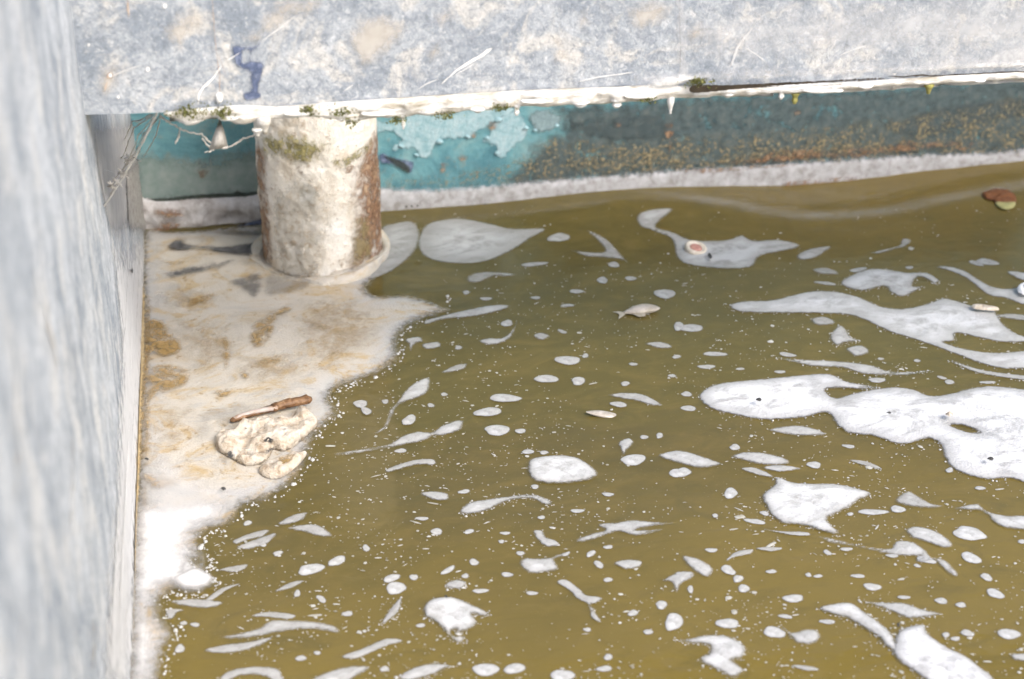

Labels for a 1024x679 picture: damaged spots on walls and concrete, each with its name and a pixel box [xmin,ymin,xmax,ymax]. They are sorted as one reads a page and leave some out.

peeling [377,108,561,159]
leakage [164,46,1024,139]
corrosion [347,136,382,266]